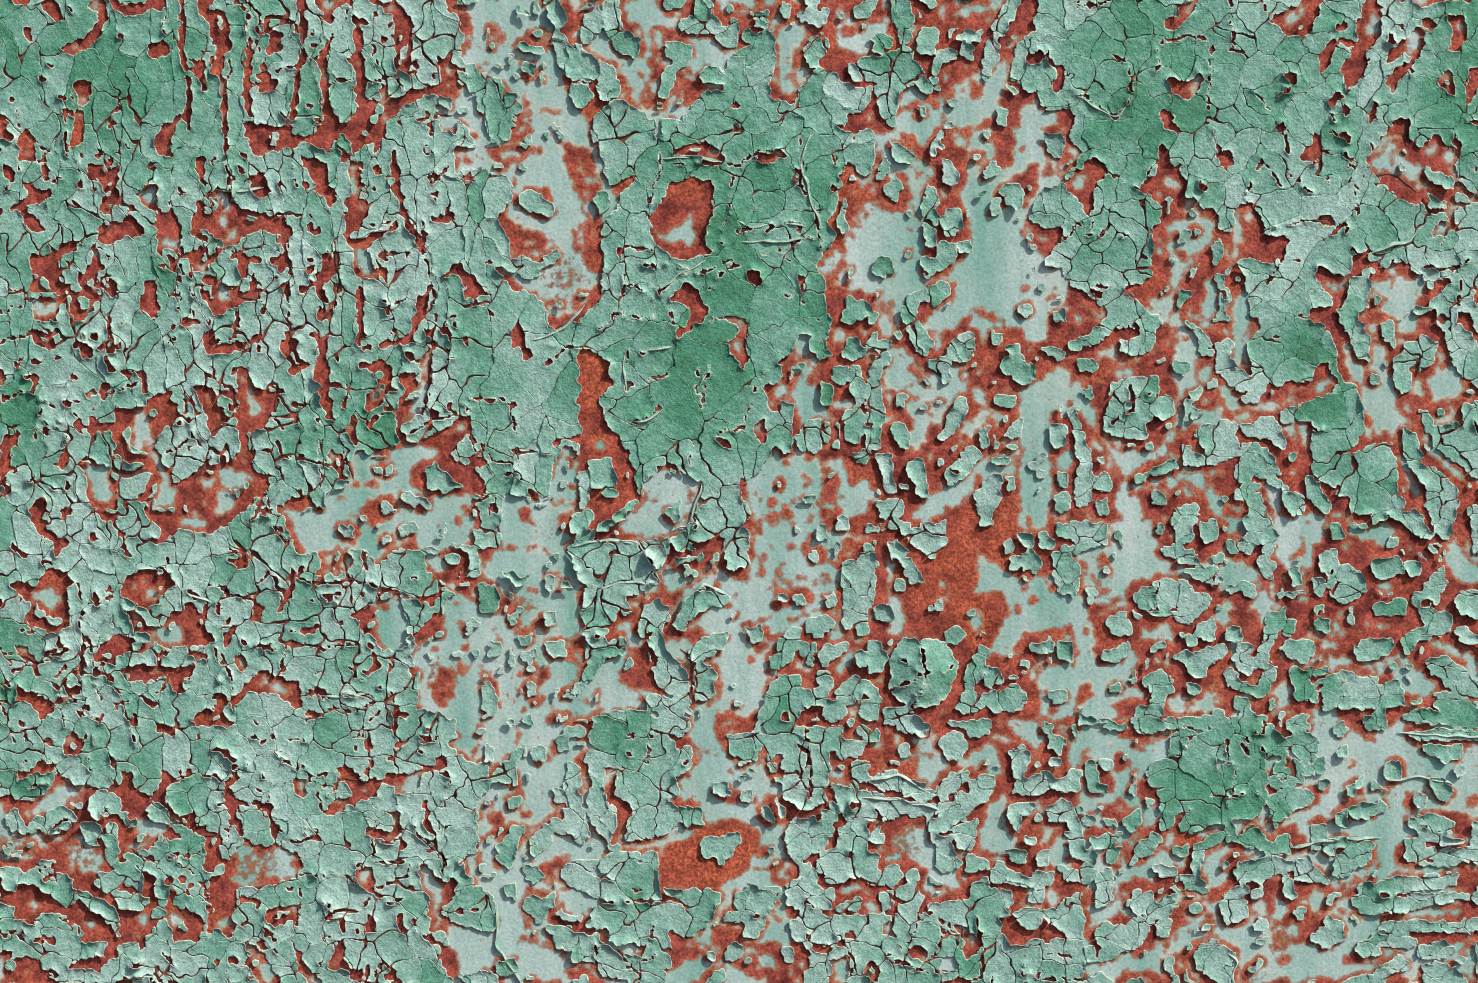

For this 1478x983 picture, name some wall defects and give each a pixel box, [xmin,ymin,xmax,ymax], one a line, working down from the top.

crack [226,159,341,339]
crack [246,1,322,76]
corrosion [0,0,812,983]
crack [399,249,538,533]
peeling [0,0,1033,983]
crack [545,133,822,430]
crack [1061,0,1415,283]
crack [1424,223,1470,305]
crack [0,583,136,780]
crack [172,382,479,983]
crack [798,730,811,799]
crack [845,918,1086,983]